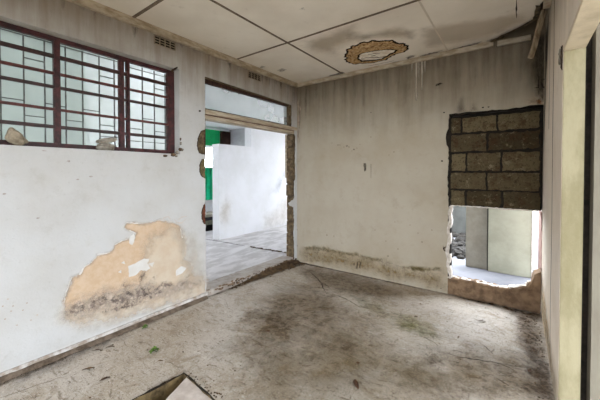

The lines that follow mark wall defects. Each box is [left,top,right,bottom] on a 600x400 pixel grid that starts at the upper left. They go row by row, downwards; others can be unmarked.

peeling [64,220,254,322]
damp [305,247,438,283]
damp [70,273,195,317]